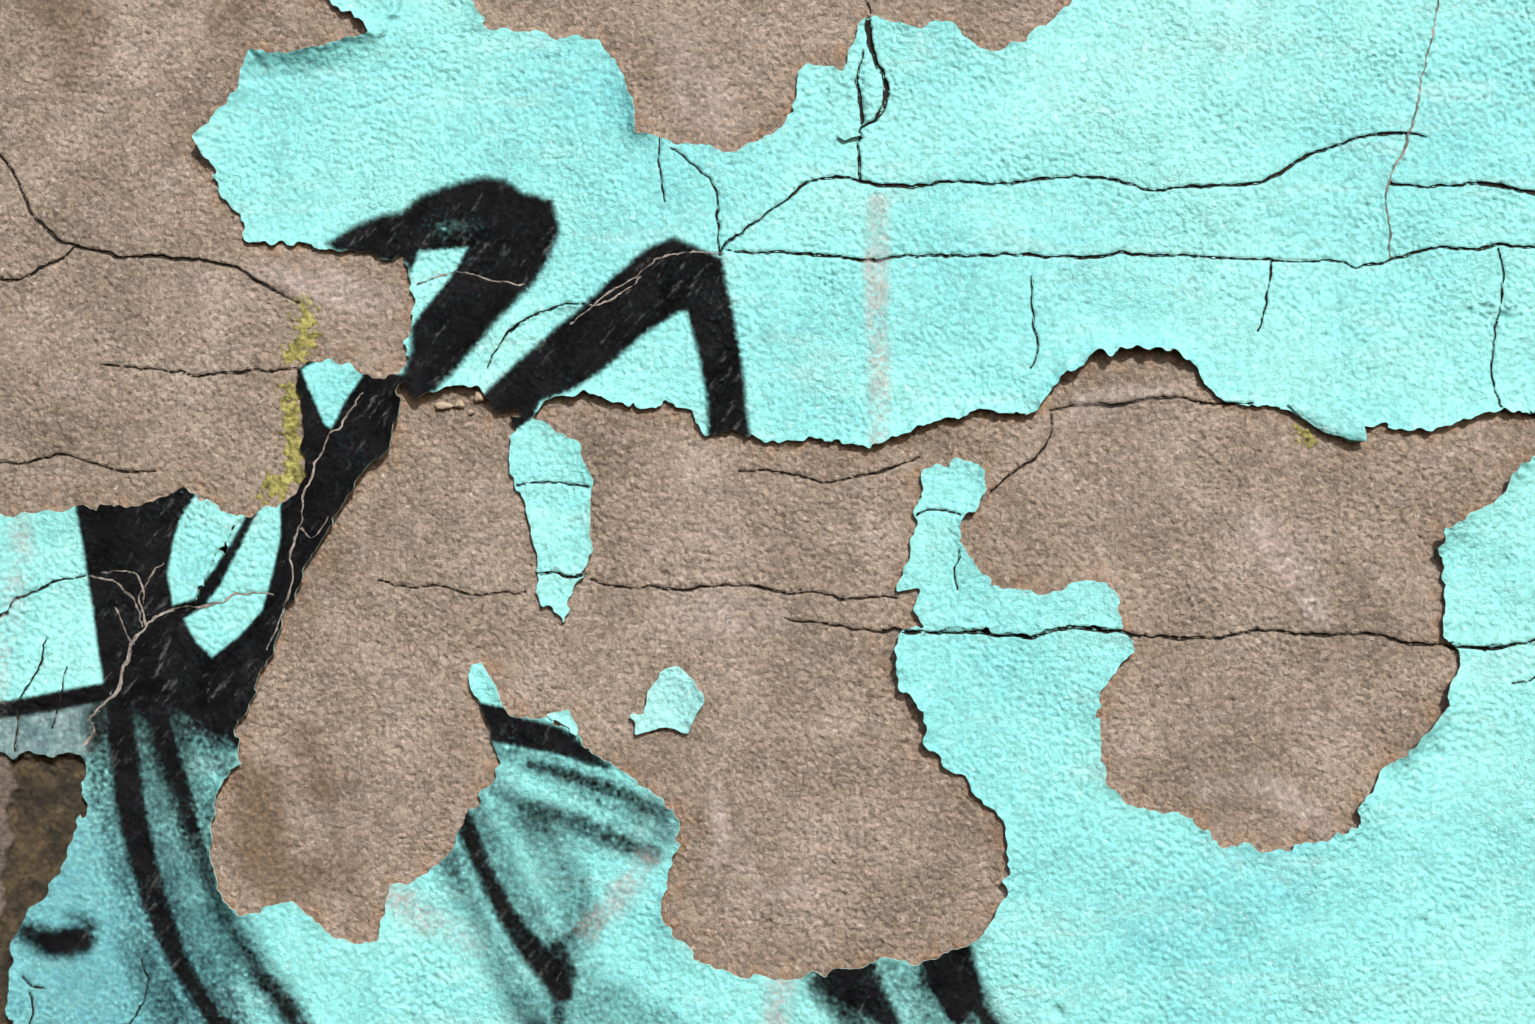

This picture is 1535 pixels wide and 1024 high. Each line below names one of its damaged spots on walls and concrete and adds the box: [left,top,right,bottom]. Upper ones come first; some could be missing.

peeling [472,0,1072,152]
crack [0,155,300,303]
peeling [0,0,416,518]
crack [417,0,1535,417]
crack [99,363,300,377]
crack [738,456,920,483]
crack [990,396,1253,493]
crack [0,393,363,752]
peeling [210,346,1535,980]
crack [916,508,961,590]
crack [377,571,1535,684]
peeling [0,752,21,946]